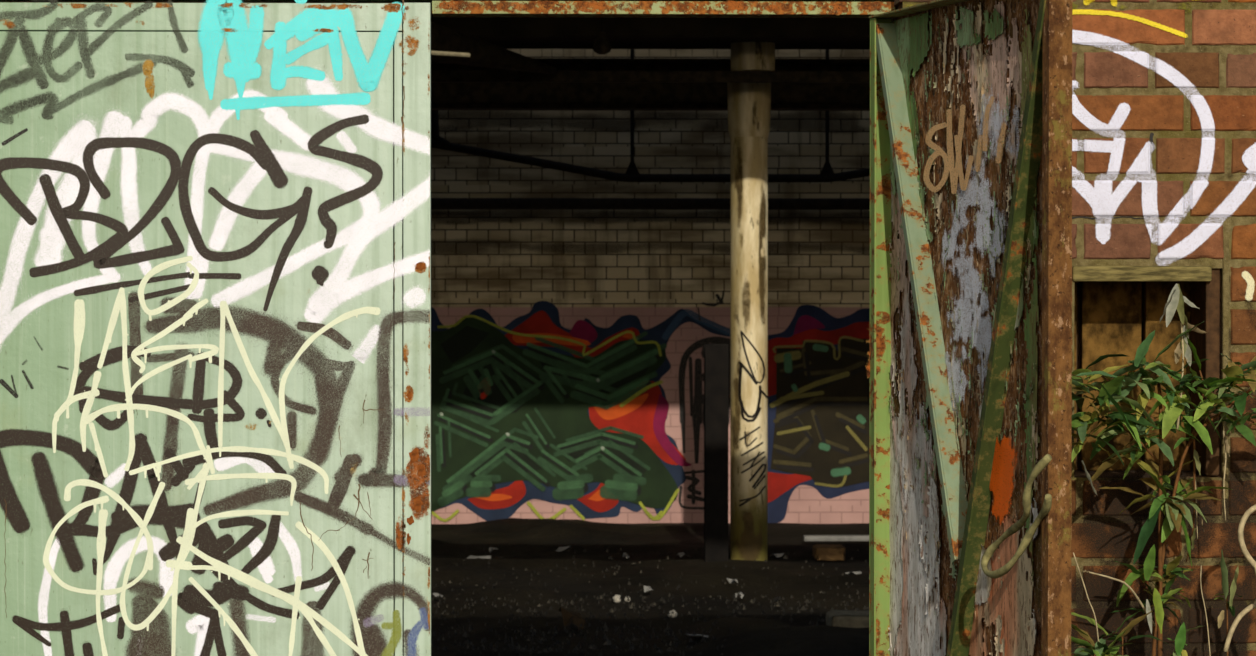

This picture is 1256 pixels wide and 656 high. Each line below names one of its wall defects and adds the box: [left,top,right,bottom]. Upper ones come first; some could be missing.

corrosion [381,3,430,77]
corrosion [435,0,643,14]
corrosion [721,0,795,14]
corrosion [824,1,892,15]
corrosion [881,174,891,195]
peeling [890,1,1033,501]
corrosion [866,311,891,379]
corrosion [403,343,414,424]
corrosion [395,424,430,599]